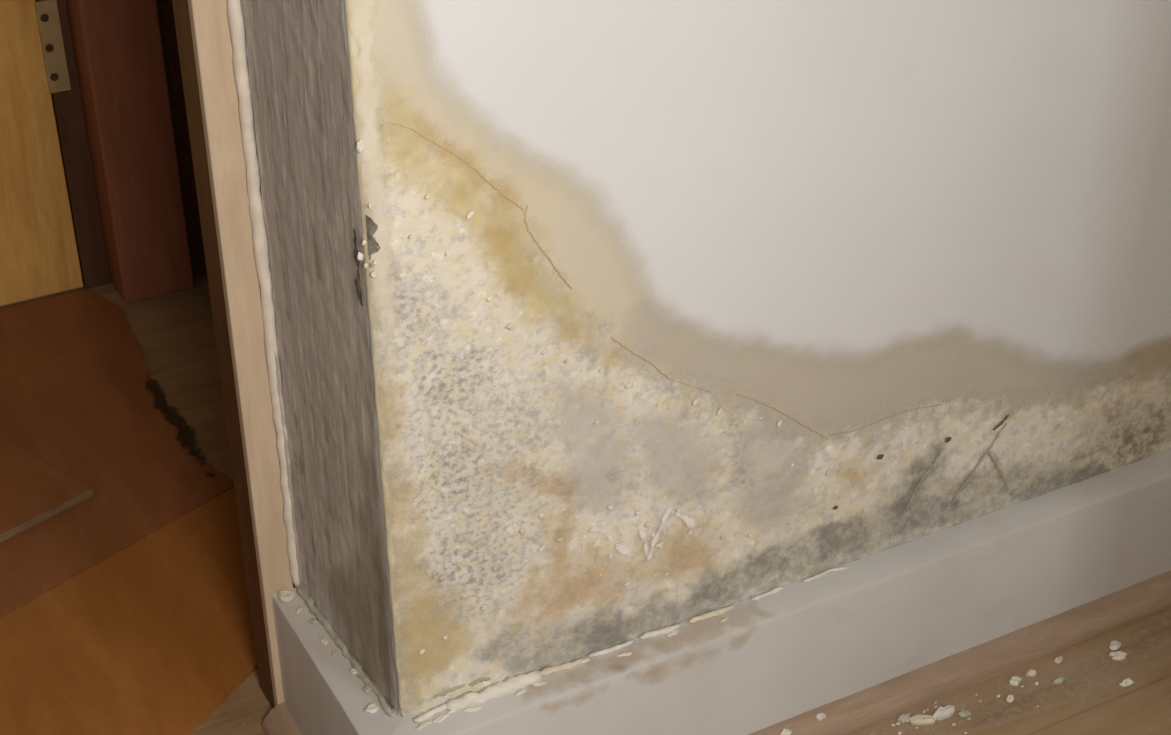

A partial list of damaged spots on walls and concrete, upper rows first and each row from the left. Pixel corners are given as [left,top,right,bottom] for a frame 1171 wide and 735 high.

crack [381,122,572,289]
damp [357,0,1171,453]
crack [611,337,709,392]
peeling [241,0,1171,730]
crack [953,415,1010,503]